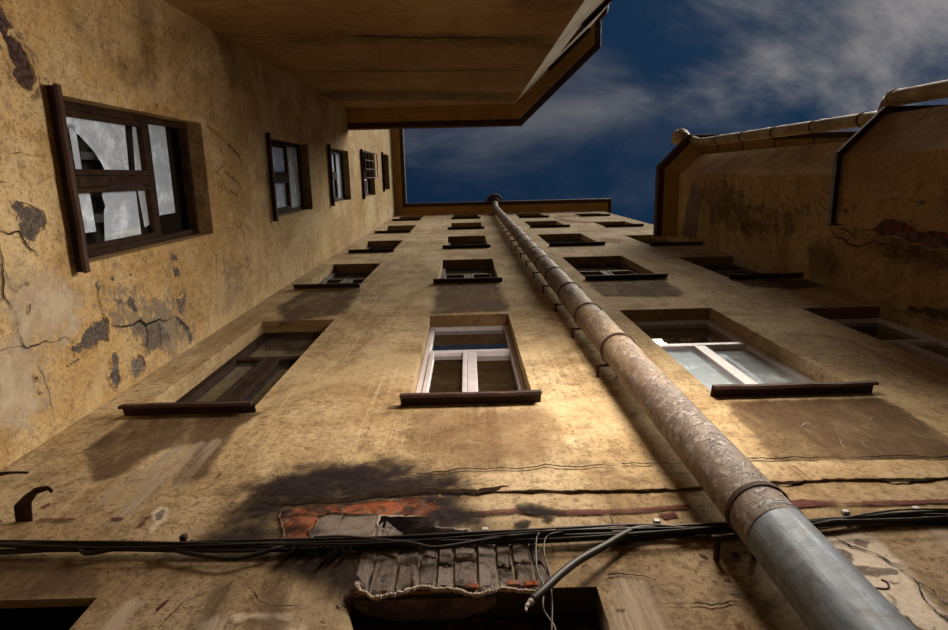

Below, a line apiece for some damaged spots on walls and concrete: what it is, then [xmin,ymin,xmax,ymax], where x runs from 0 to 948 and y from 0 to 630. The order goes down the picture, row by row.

peeling [0,0,47,98]
spalling [5,194,50,248]
flaking render [864,217,948,251]
crack [0,230,79,427]
spalling [66,276,192,392]
flaking render [276,494,472,538]
spalling [837,539,904,584]
crack [836,538,948,621]